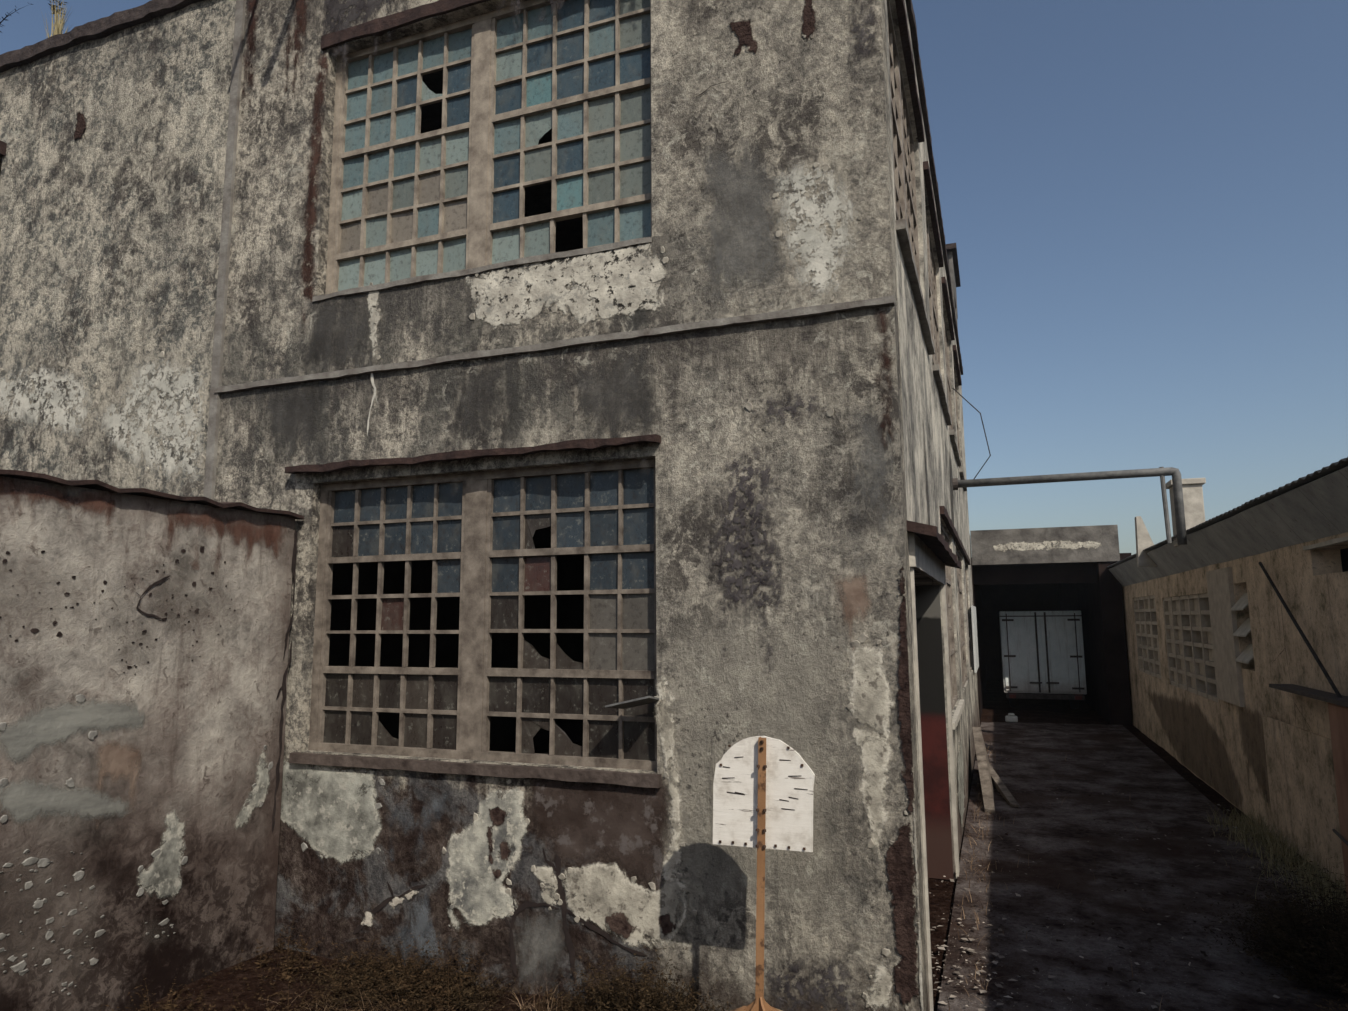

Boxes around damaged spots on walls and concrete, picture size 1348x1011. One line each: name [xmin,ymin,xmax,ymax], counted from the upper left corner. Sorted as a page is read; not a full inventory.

rust [285,0,307,92]
rust [302,54,329,321]
peeling [466,243,669,328]
peeling [136,809,188,938]
peeling [235,745,385,863]
peeling [442,675,697,948]